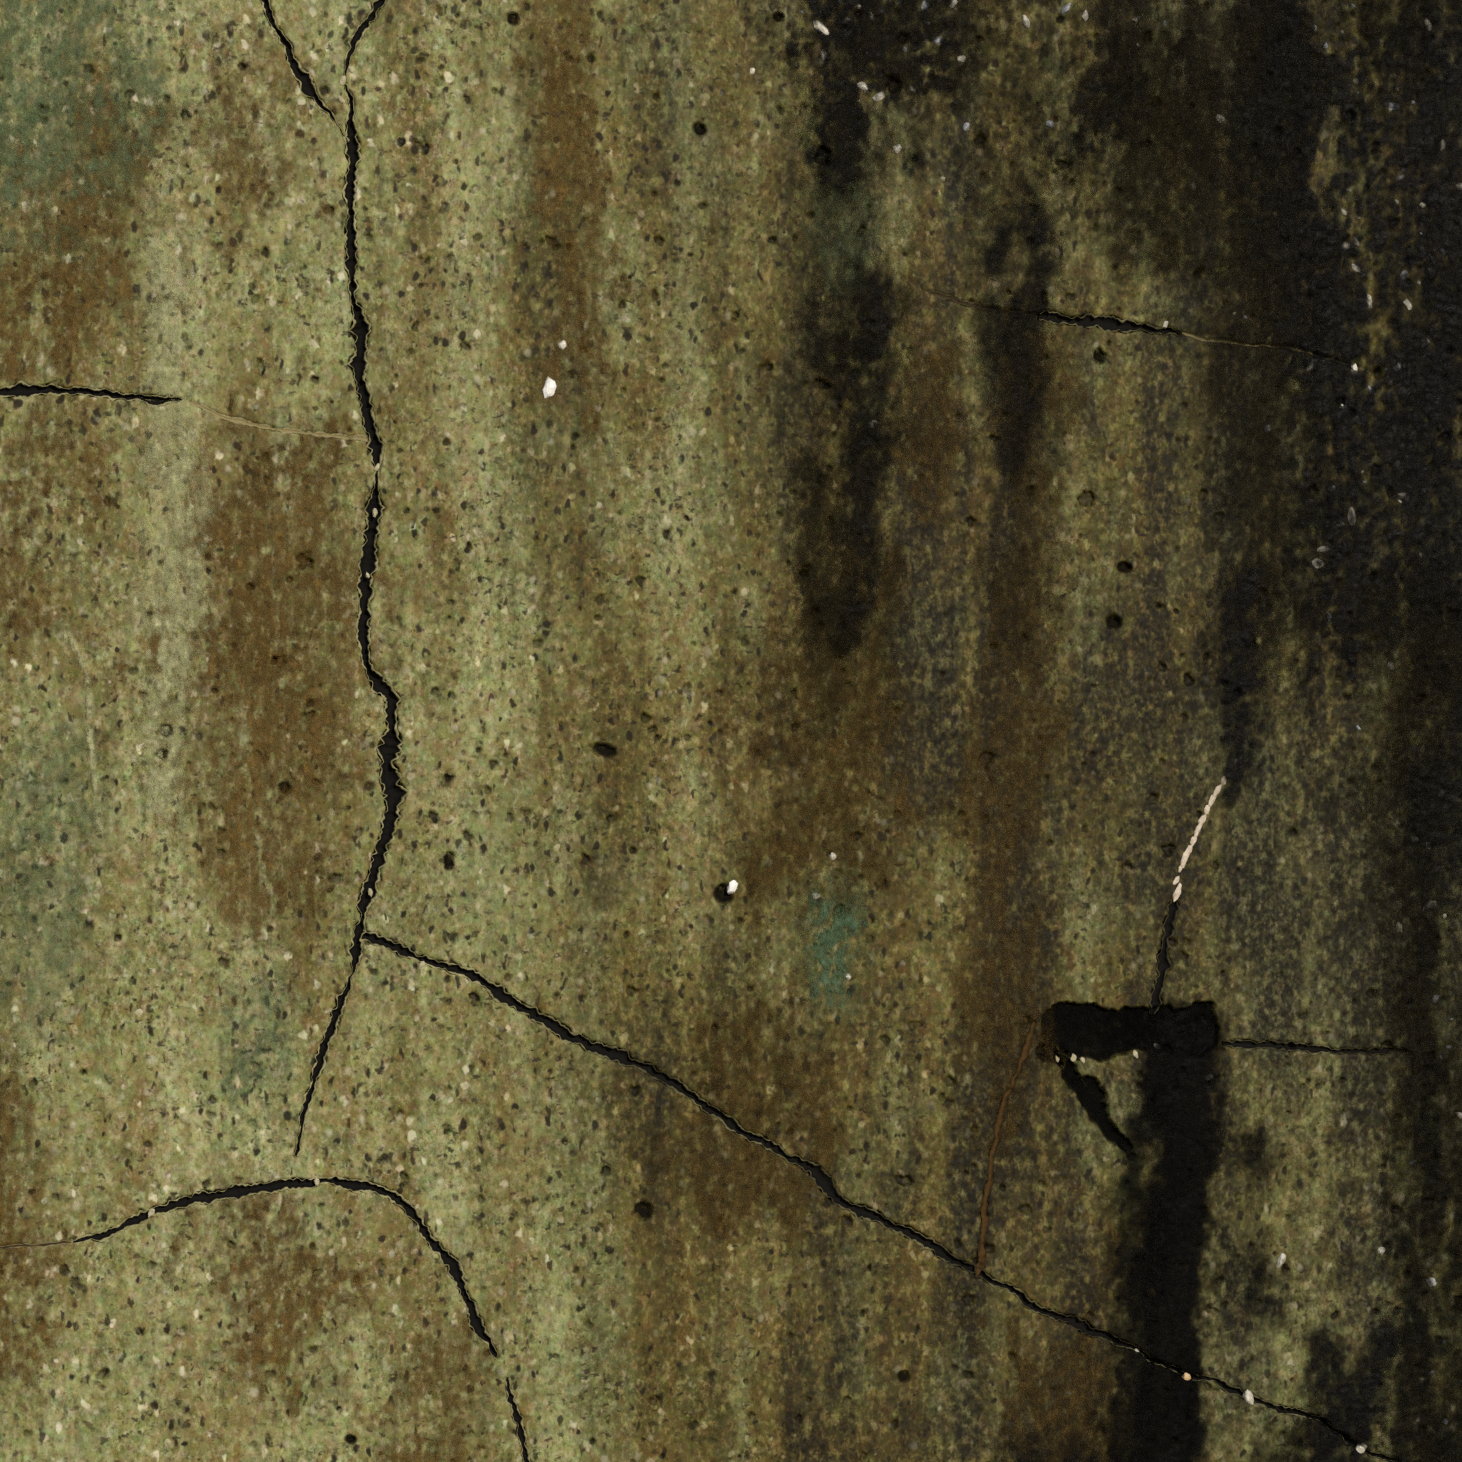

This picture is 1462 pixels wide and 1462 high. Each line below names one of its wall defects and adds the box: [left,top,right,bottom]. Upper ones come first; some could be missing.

crack [0,381,185,407]
crack [190,0,1321,1420]
damp [786,0,1462,1462]
crack [1223,1039,1408,1056]
crack [0,1176,499,1358]
crack [504,1378,530,1462]
crack [1343,1436,1395,1462]